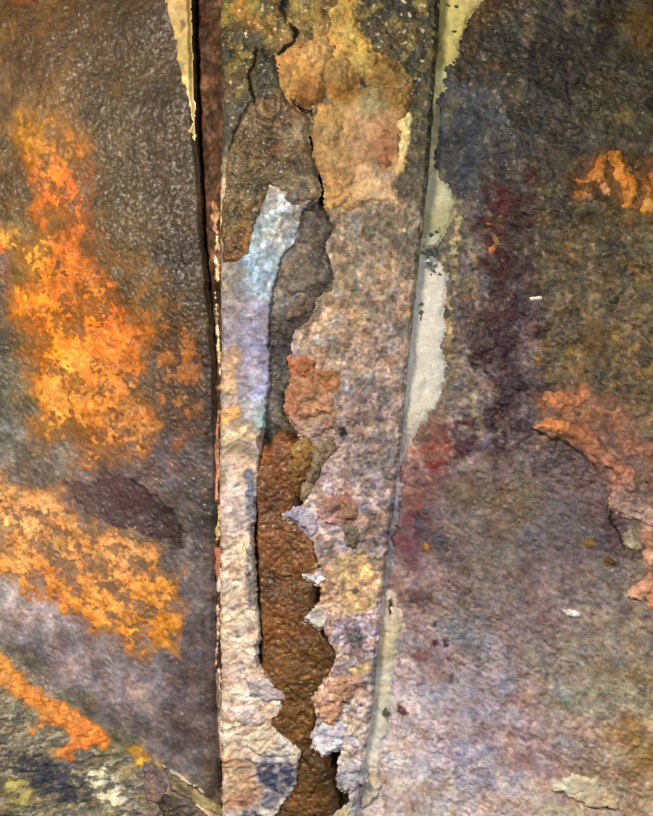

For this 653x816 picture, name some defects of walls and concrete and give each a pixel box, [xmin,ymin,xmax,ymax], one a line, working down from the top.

corrosion [0,111,200,468]
peeling [165,0,196,140]
crack [230,11,299,147]
crack [262,107,335,448]
peeling [275,0,414,212]
corrosion [563,150,653,226]
peeling [282,355,361,550]
peeling [333,0,484,816]
corrosion [0,478,182,660]
corrosion [0,652,111,801]
crack [329,751,340,772]
crack [336,792,349,810]